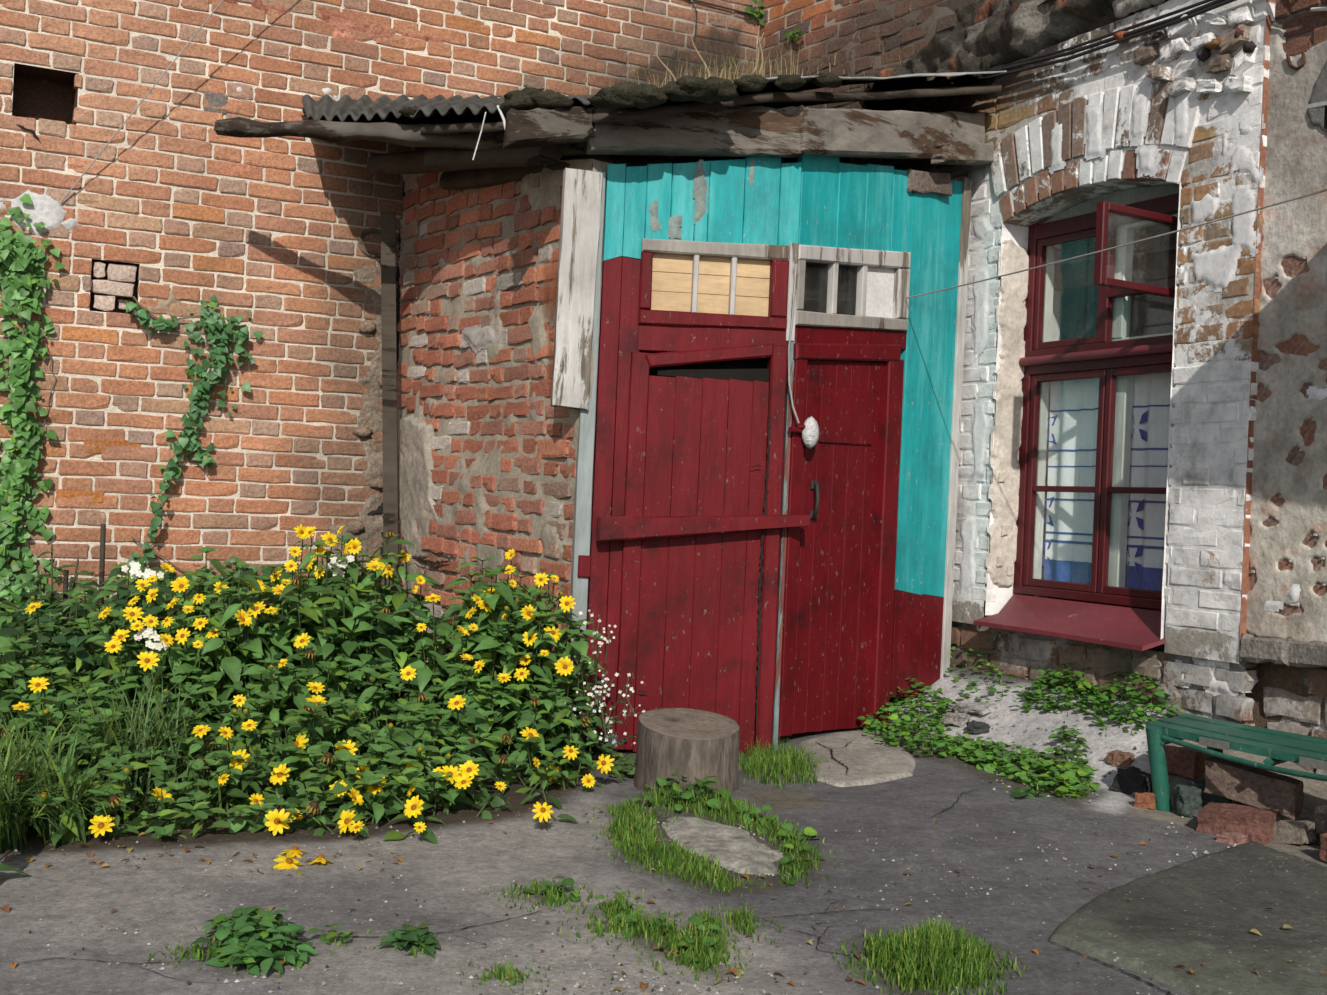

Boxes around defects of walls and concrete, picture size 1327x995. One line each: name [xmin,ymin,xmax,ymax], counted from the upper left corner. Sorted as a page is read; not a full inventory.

peeling [1048,122,1066,174]
peeling [1084,102,1106,160]
peeling [1129,77,1193,178]
peeling [1185,114,1265,294]
flaking render [1263,256,1310,299]
flaking render [1257,334,1327,402]
flaking render [1286,418,1316,466]
flaking render [1262,493,1285,527]
peeling [1264,531,1327,616]
crack [815,741,852,774]